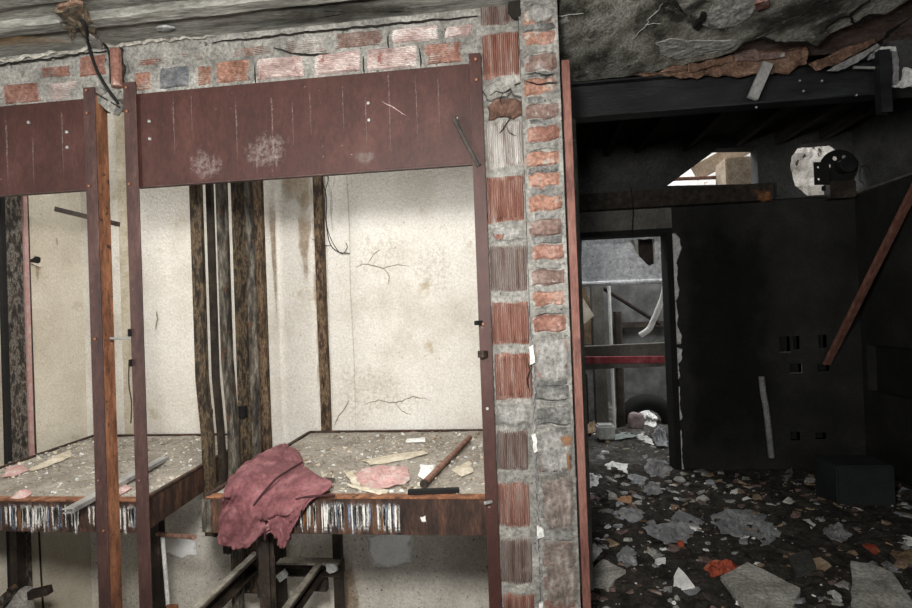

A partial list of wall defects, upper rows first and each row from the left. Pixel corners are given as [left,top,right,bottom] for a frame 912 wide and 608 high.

crack [0,15,478,83]
spalling [630,0,912,88]
crack [491,72,556,136]
crack [334,188,431,427]